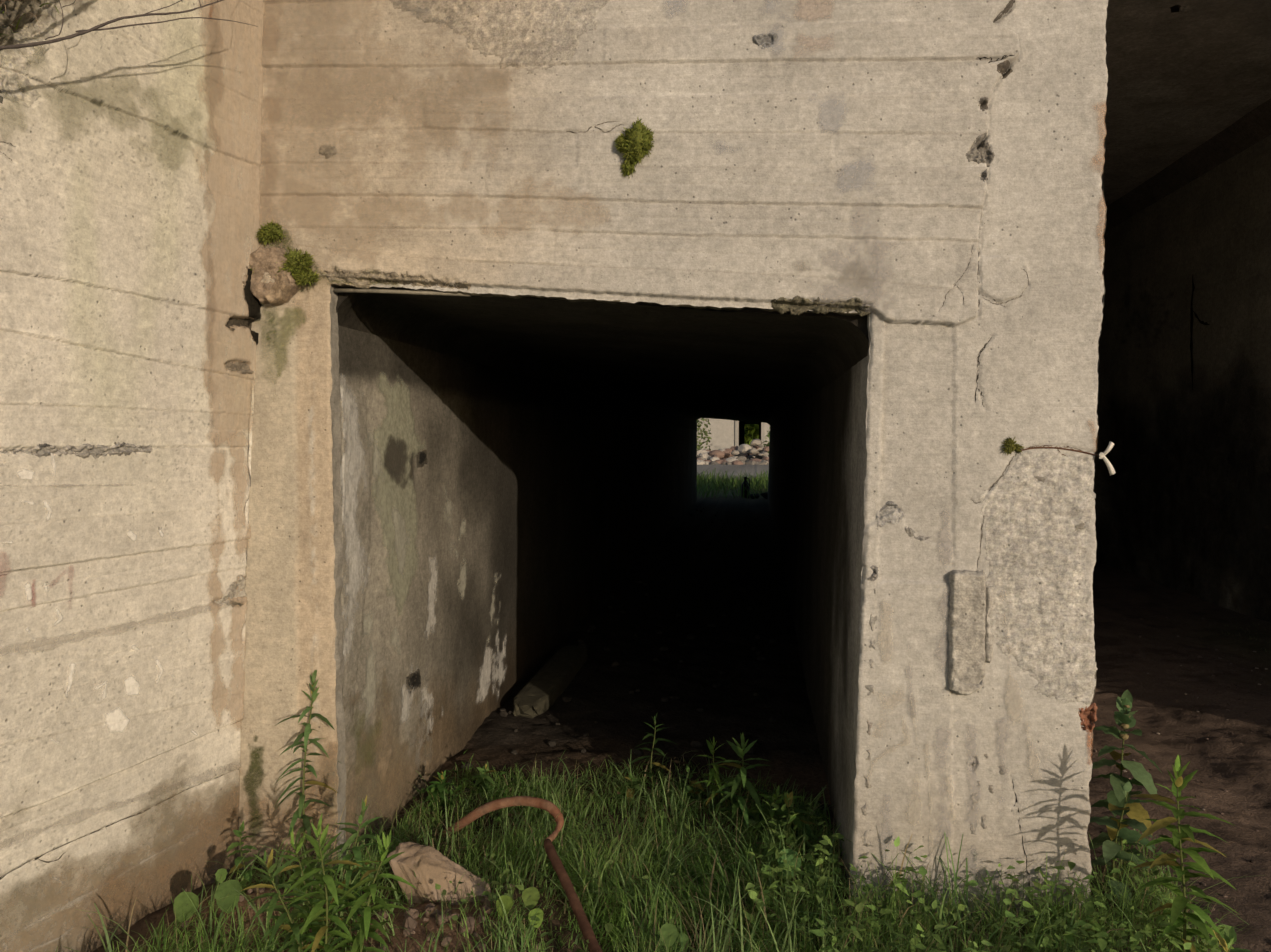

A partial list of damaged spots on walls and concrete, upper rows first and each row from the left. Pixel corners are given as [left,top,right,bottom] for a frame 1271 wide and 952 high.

spalling [388,0,610,74]
spalling [993,0,1015,23]
spalling [996,60,1013,79]
spalling [978,97,988,111]
spalling [966,132,995,182]
water stain [202,0,265,552]
spalling [225,266,262,346]
crack [939,208,1029,311]
spalling [224,358,254,375]
crack [975,337,992,405]
spalling [0,442,153,459]
water stain [1,538,247,727]